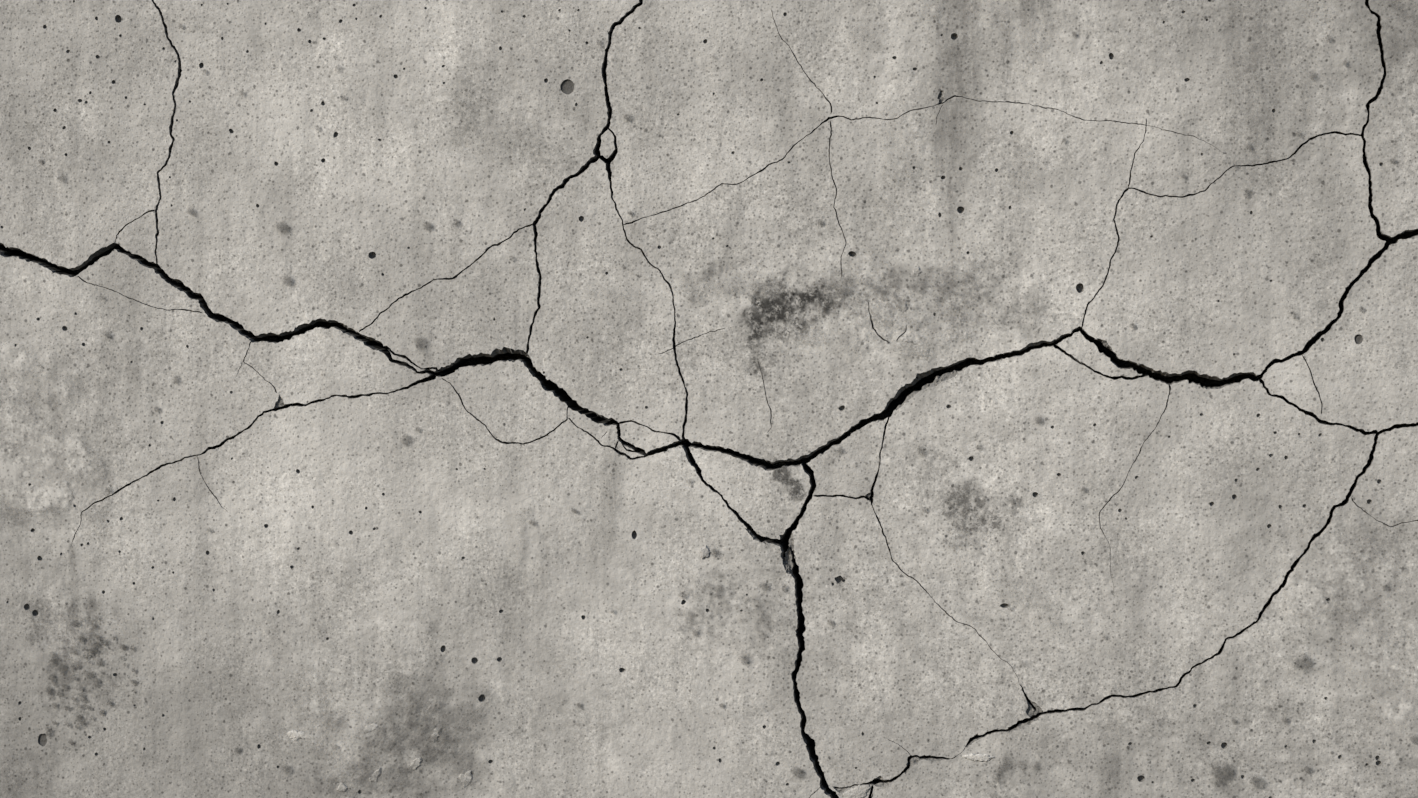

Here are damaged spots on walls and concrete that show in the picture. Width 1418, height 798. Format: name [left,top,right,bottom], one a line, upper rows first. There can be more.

crack [0,0,981,546]
crack [682,0,1418,798]